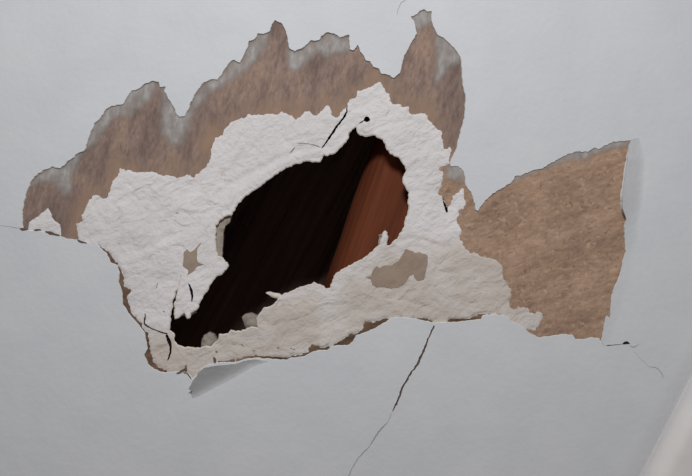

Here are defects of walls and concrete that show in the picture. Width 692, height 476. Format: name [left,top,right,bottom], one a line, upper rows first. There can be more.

crack [290,108,364,153]
flaking render [28,209,61,236]
flaking render [76,82,543,379]
crack [144,314,191,378]
crack [348,326,435,476]